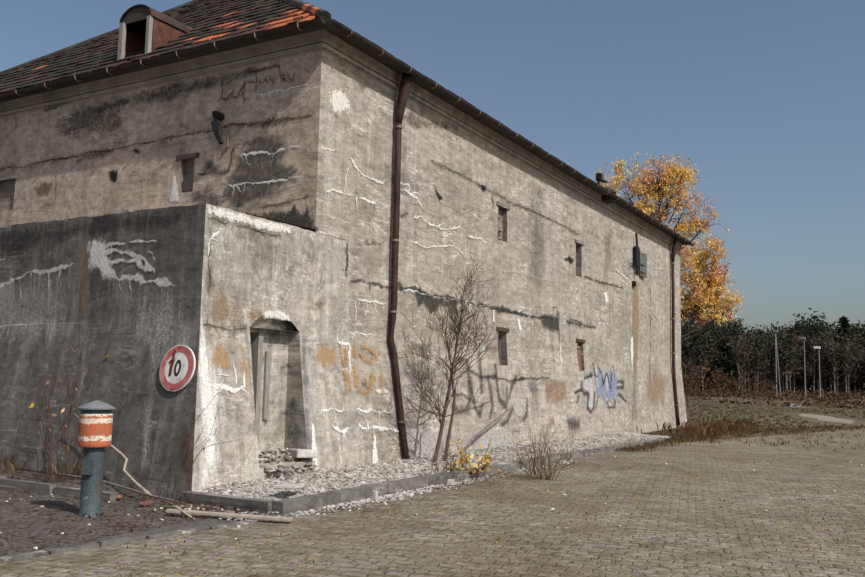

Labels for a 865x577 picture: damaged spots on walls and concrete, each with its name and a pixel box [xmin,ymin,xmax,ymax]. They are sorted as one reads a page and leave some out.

crack [253,82,306,100]
crack [0,115,312,198]
water stain [169,176,179,202]
water stain [193,136,293,233]
crack [197,145,487,285]
crack [0,258,74,298]
crack [104,239,175,292]
crack [200,311,246,340]
crack [337,294,386,372]
crack [315,389,399,439]